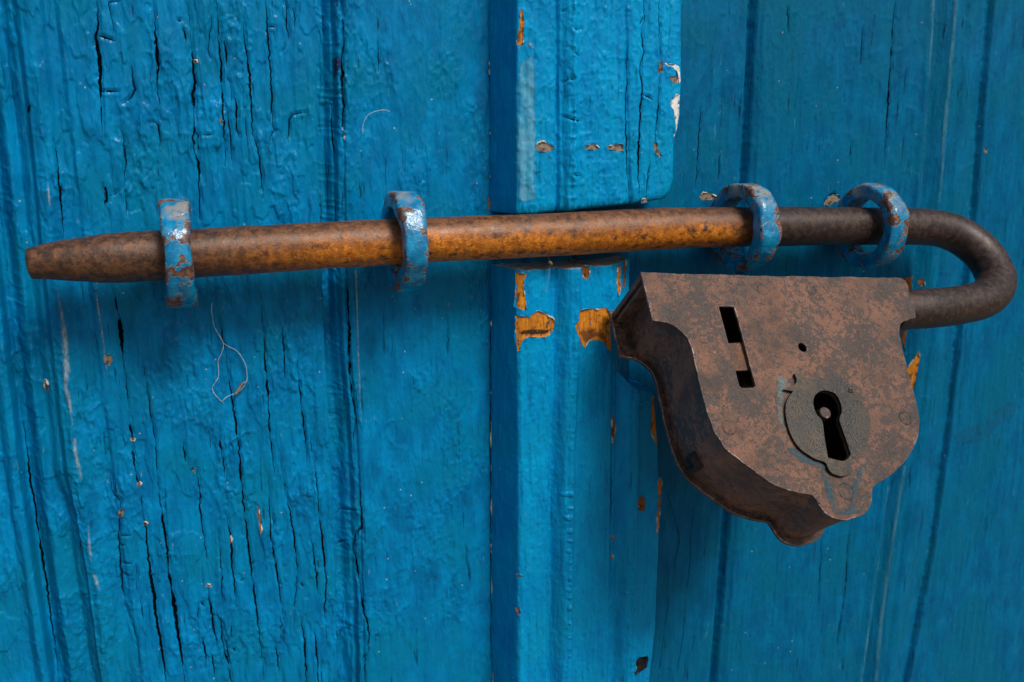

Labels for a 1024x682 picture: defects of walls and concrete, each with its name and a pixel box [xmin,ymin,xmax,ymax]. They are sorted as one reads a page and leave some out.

crack [94,0,121,130]
crack [149,3,161,143]
crack [183,1,296,218]
peeling [516,11,525,45]
peeling [535,140,555,153]
peeling [585,143,624,152]
crack [625,0,660,201]
peeling [658,59,681,136]
peeling [513,272,555,352]
peeling [575,261,627,350]
crack [23,423,59,674]
crack [113,287,327,682]